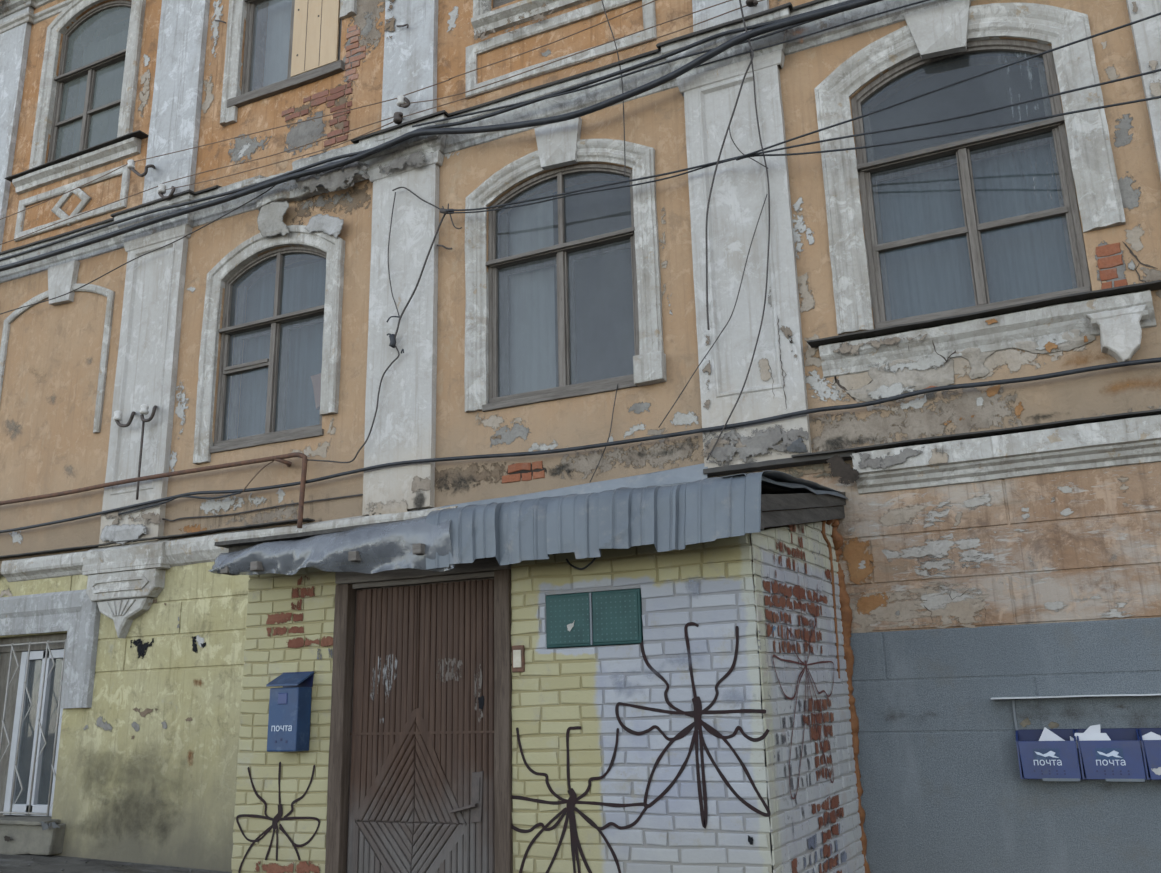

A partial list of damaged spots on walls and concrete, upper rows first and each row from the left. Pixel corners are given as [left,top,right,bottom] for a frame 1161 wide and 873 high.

spalling [281,0,396,152]
peeling [1114,113,1134,148]
peeling [1118,171,1142,211]
peeling [792,197,814,259]
crack [908,340,956,362]
crack [834,376,872,400]
flaking render [365,325,1086,516]
peeling [841,493,996,633]